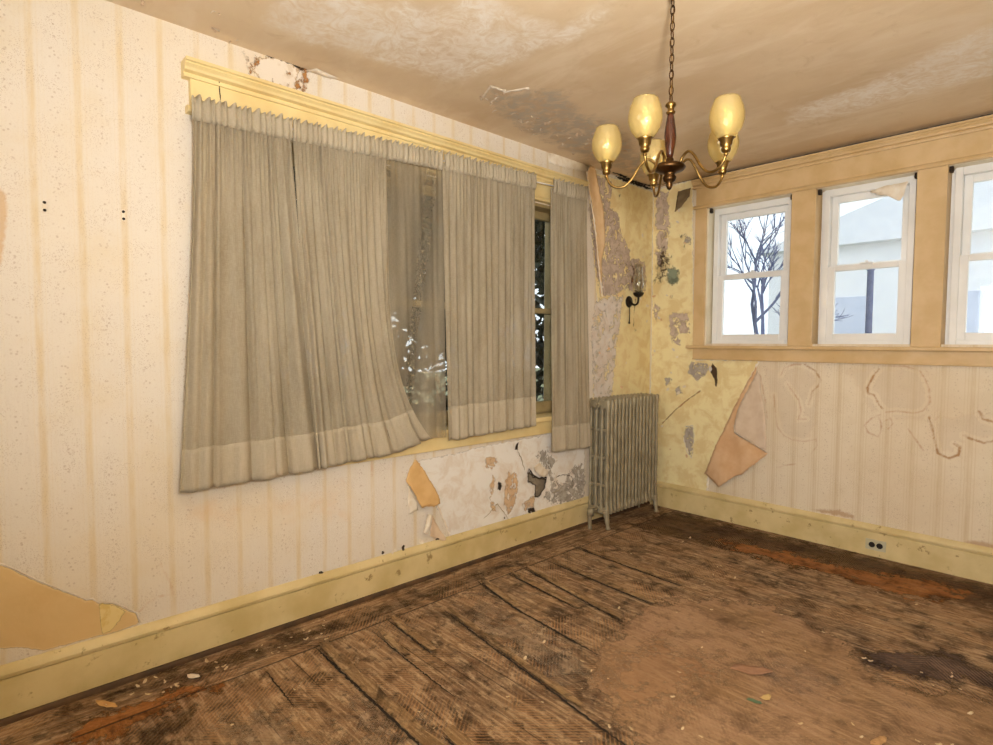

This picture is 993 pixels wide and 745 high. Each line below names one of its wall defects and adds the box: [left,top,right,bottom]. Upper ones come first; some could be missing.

peeling [106,0,169,16]
water stain [286,68,309,92]
water stain [0,169,19,282]
peeling [238,0,690,398]
peeling [688,362,718,386]
flaking render [683,425,695,458]
peeling [704,367,768,487]
peeling [406,460,446,544]
flaking render [527,446,586,513]